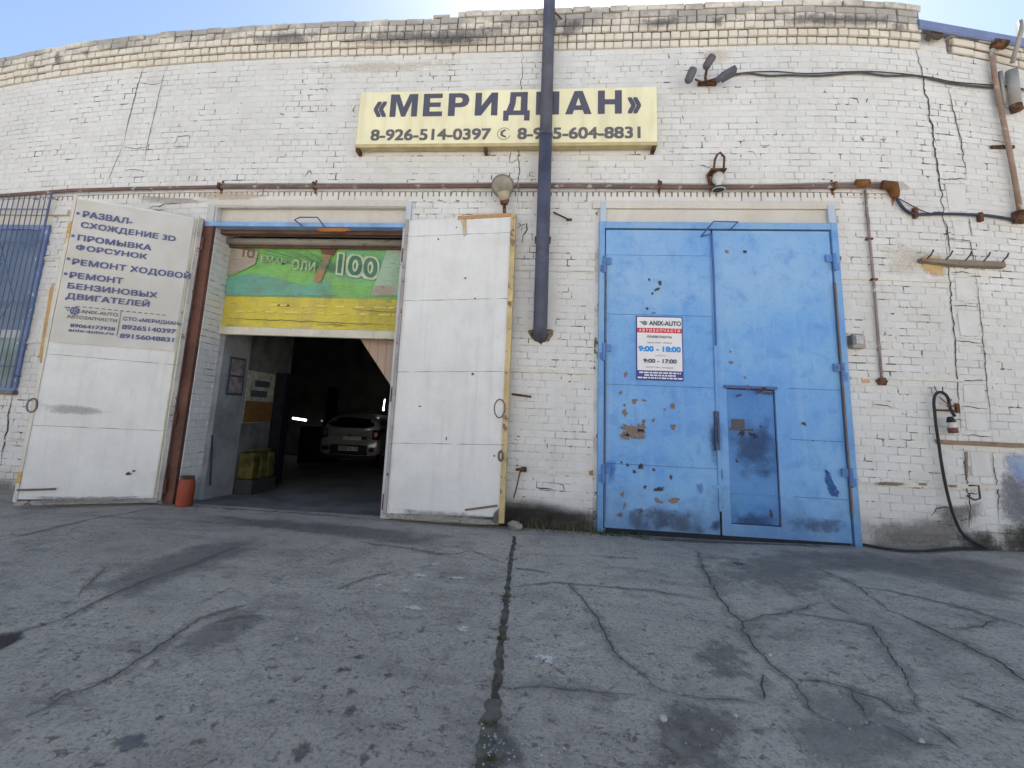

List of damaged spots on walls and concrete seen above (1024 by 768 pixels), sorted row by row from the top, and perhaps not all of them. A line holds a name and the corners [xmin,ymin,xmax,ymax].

leakage [499,511,588,532]
crack [916,50,1000,526]